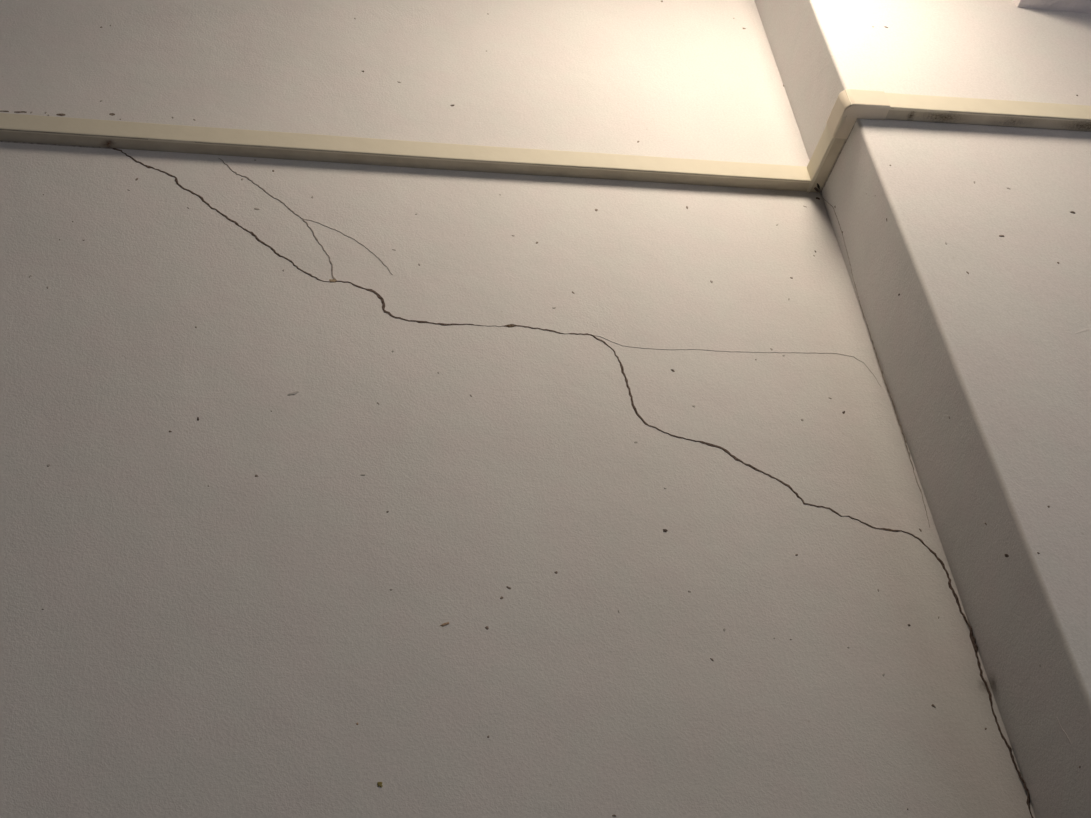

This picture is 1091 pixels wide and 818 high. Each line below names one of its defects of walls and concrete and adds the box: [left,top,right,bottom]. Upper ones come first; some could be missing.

crack [0,109,66,117]
crack [0,141,1033,818]